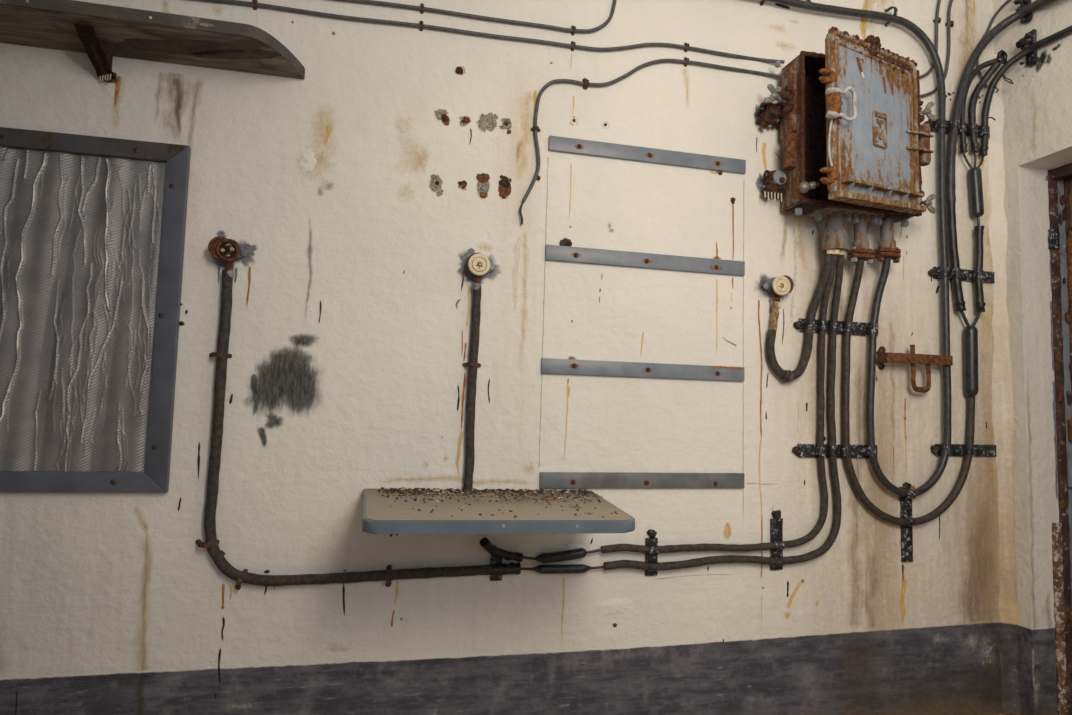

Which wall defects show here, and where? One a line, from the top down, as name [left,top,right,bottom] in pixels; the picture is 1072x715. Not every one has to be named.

spalling [433,108,513,134]
spalling [428,174,443,196]
spalling [457,173,512,200]
rust [1052,182,1072,284]
rust [1056,351,1072,405]